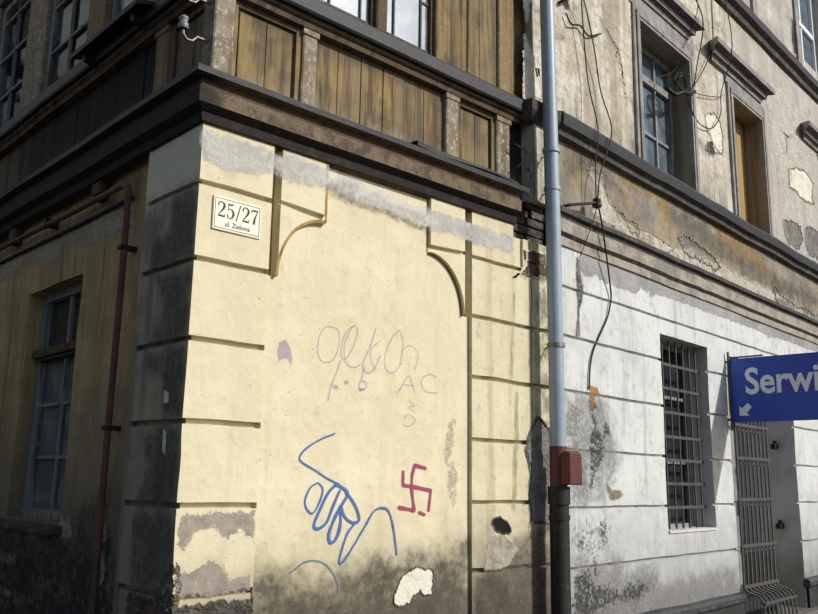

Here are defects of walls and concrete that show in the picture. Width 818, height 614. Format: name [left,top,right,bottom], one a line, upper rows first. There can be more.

peeling [705,111,724,158]
peeling [788,166,815,205]
spalling [519,247,547,281]
peeling [586,166,721,272]
spalling [782,218,818,261]
water stain [567,400,611,488]
spalling [524,416,550,525]
peeling [178,510,255,551]
peeling [484,516,519,571]
peeling [153,560,251,612]
spalling [392,566,434,608]
water stain [572,556,734,614]